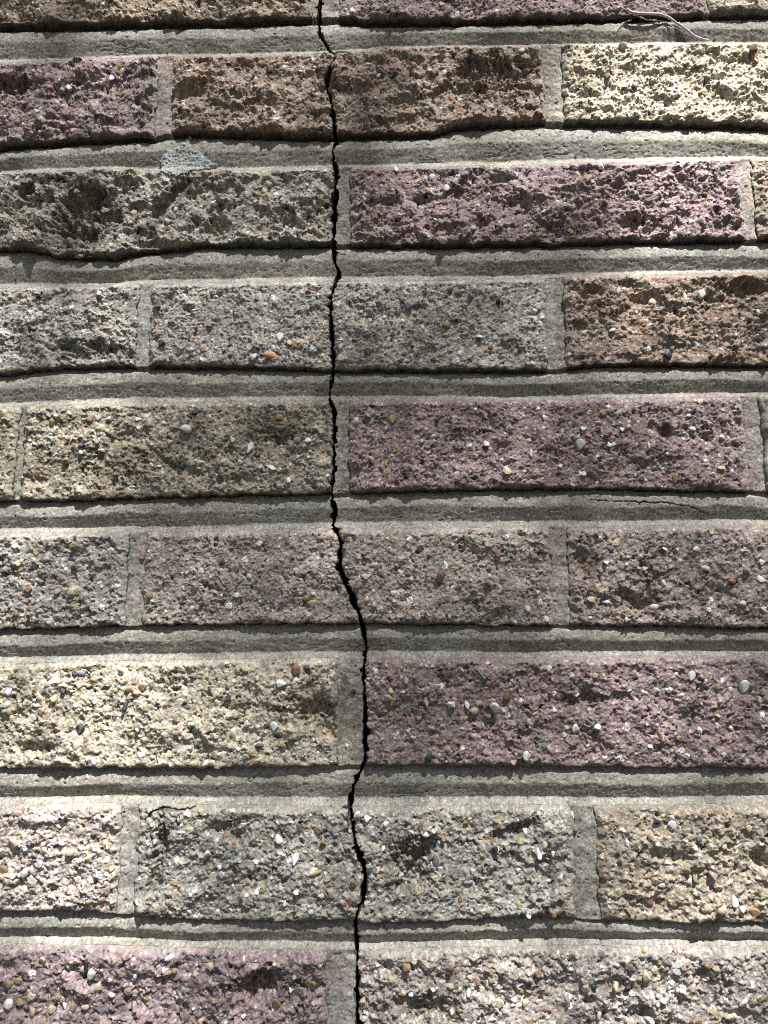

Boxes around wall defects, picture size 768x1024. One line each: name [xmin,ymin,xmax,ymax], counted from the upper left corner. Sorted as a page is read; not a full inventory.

crack [316,0,371,1024]